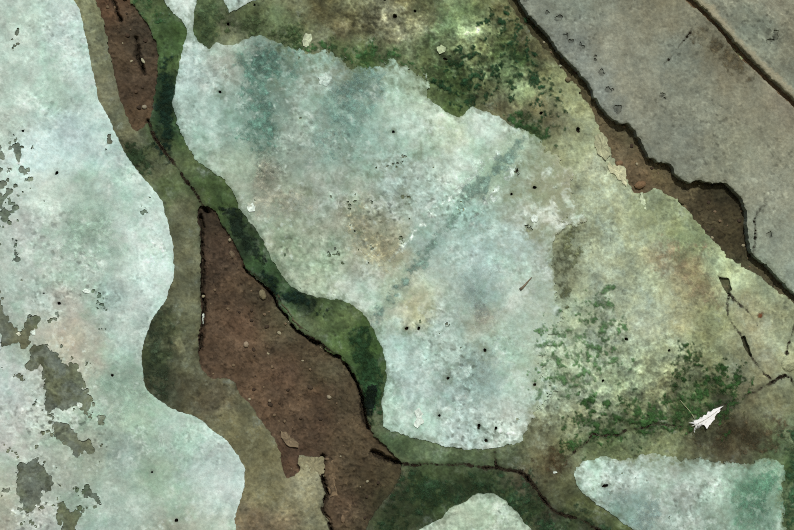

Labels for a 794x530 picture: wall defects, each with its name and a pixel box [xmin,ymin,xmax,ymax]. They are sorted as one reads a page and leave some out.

peeling [0,135,33,228]
spalling [74,0,614,530]
peeling [0,290,105,457]
crack [246,269,371,431]
crack [725,356,791,405]
crack [573,424,675,453]
peeling [2,444,102,530]
crack [320,455,332,530]
crack [371,450,601,530]